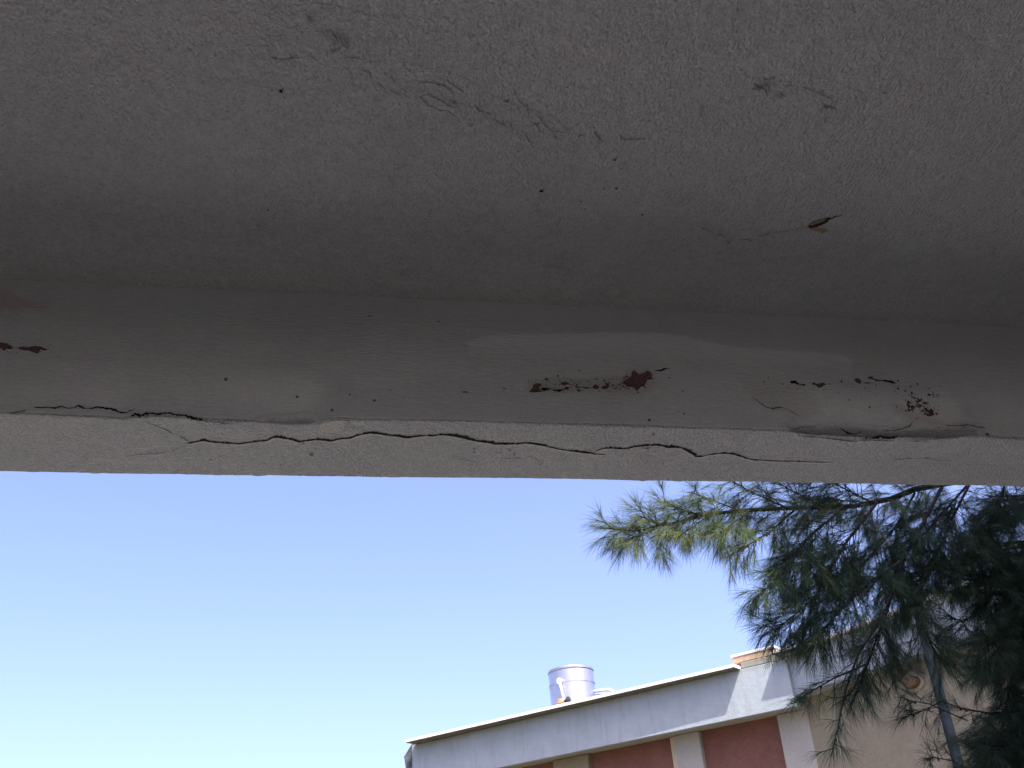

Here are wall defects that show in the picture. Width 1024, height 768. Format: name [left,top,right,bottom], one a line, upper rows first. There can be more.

crack [9,405,834,464]